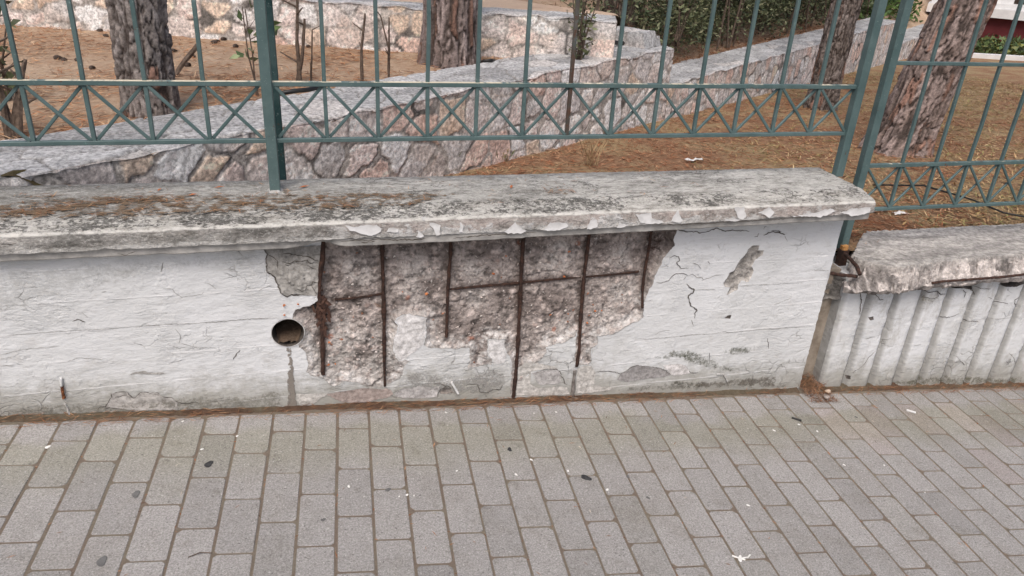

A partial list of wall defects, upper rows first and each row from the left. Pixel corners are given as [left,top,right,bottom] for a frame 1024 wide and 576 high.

peeling [726,207,746,222]
peeling [793,207,871,217]
spalling [724,245,764,295]
spalling [292,209,690,403]
crack [599,217,828,375]